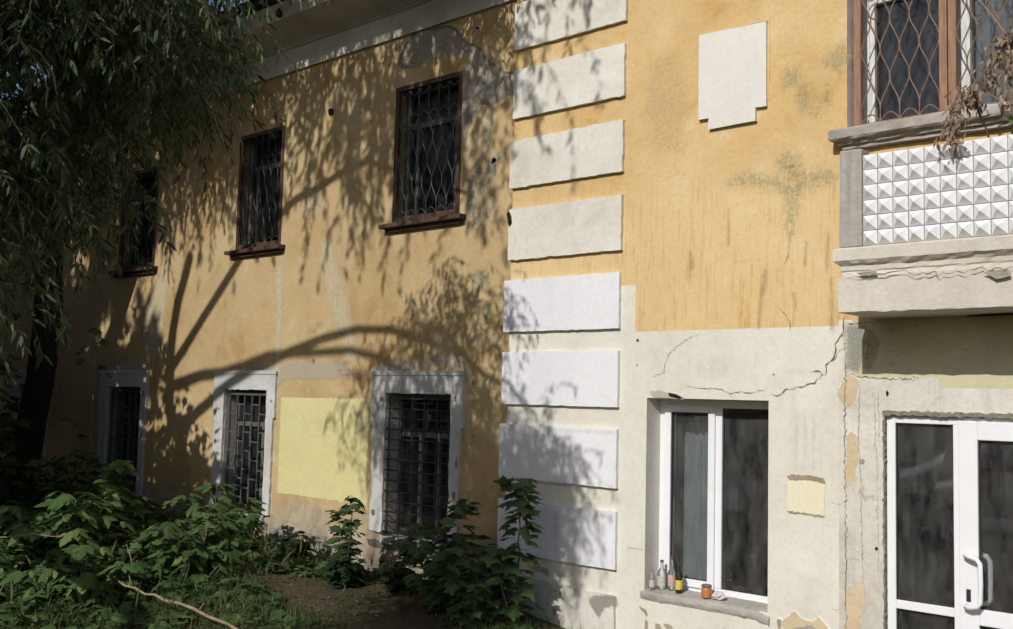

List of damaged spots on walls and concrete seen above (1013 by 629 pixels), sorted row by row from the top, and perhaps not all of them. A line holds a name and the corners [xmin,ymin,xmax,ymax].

spalling [398,27,514,140]
crack [839,266,1013,278]
peeling [836,374,860,409]
crack [690,314,918,628]
peeling [843,430,861,489]
spalling [590,595,615,616]
peeling [639,606,672,629]
spalling [776,609,831,629]
peeling [843,575,868,629]